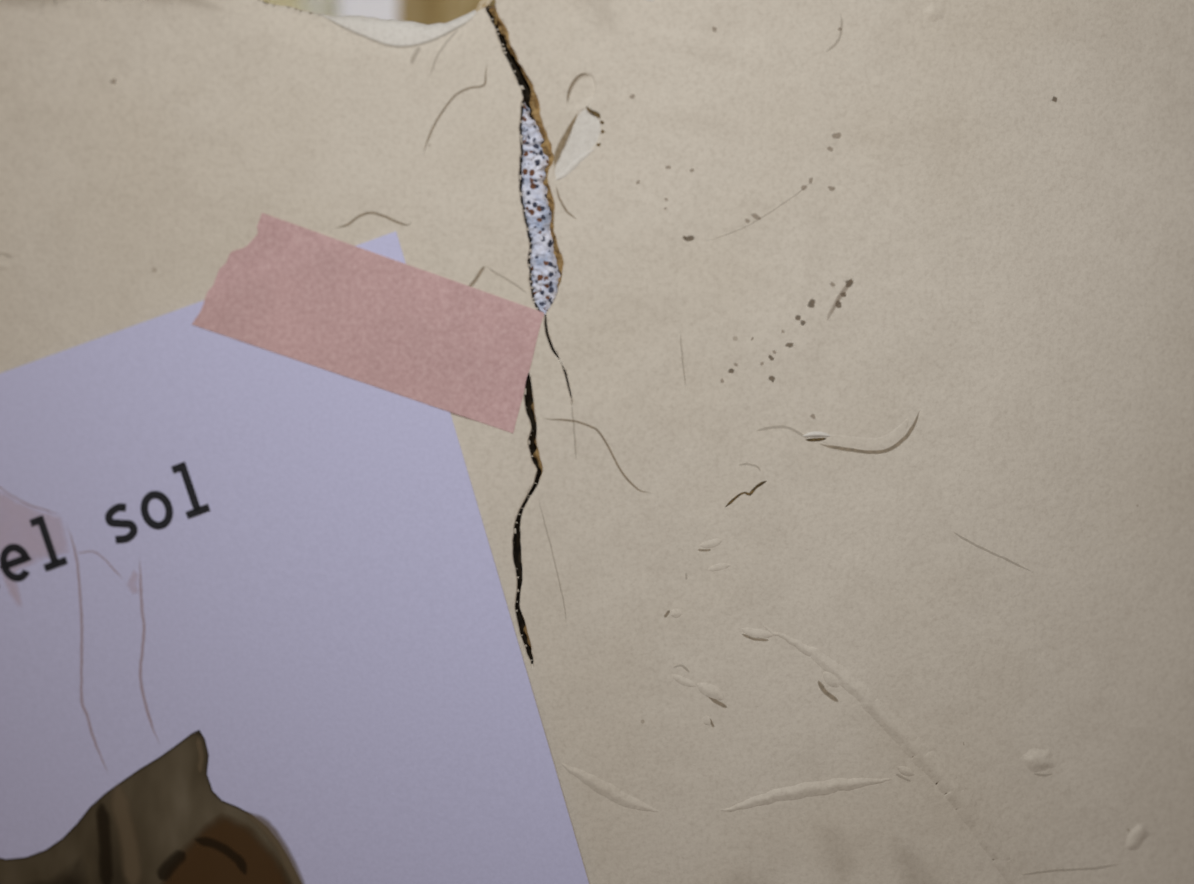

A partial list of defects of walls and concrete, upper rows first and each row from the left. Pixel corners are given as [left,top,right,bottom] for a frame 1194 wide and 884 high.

crack [425,4,644,667]
spalling [554,73,604,219]